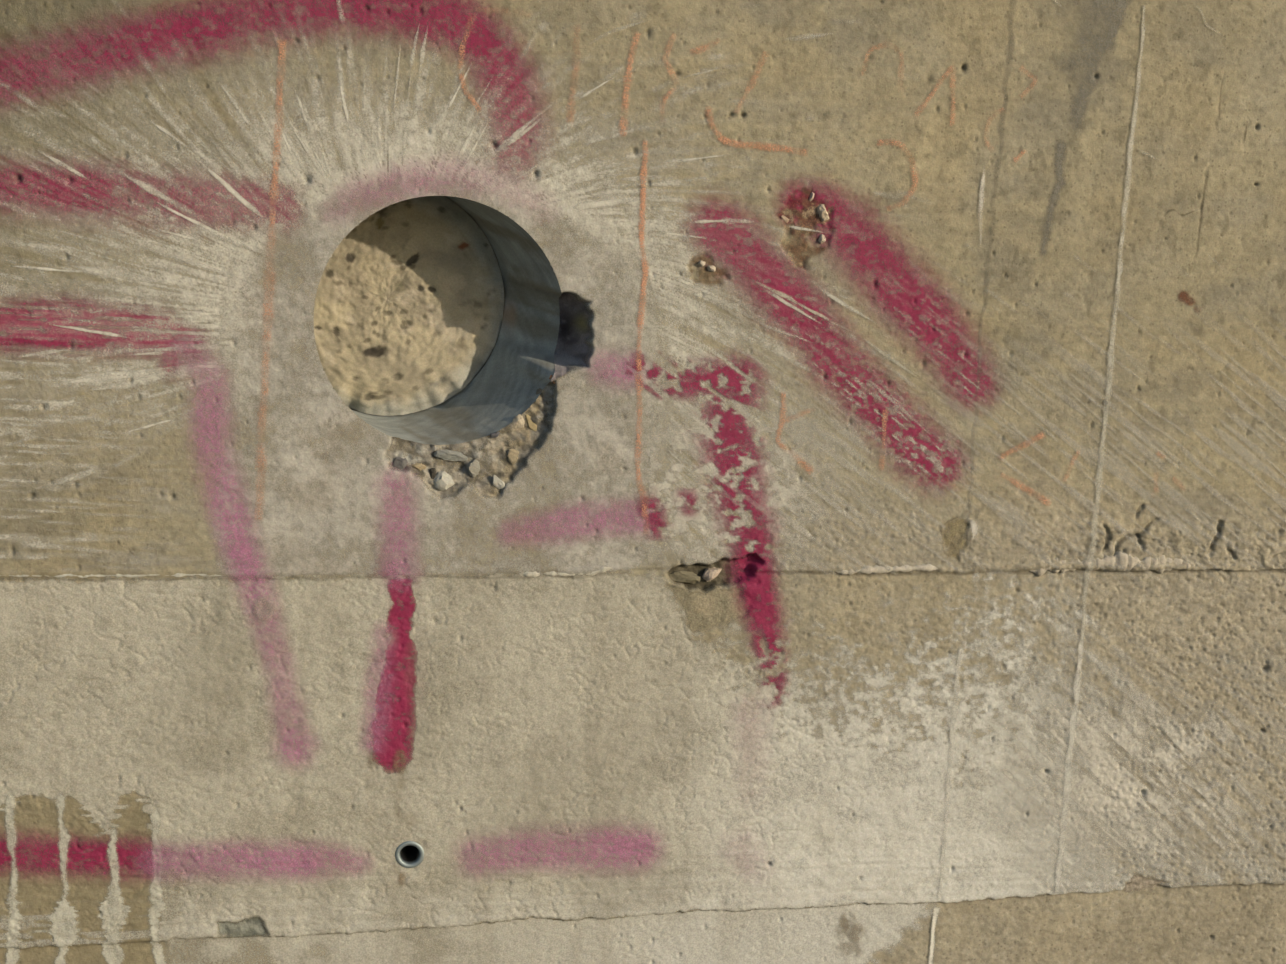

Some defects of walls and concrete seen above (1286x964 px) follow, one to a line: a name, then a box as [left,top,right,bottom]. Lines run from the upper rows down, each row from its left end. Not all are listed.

damp [26,131,83,176]
damp [499,122,537,150]
damp [129,178,170,201]
spalling [778,190,829,267]
damp [1106,7,1145,397]
damp [57,309,118,337]
damp [773,294,815,320]
spalling [388,292,592,498]
damp [0,398,100,454]
damp [834,377,950,473]
spalling [943,519,978,560]
peeling [668,556,747,632]